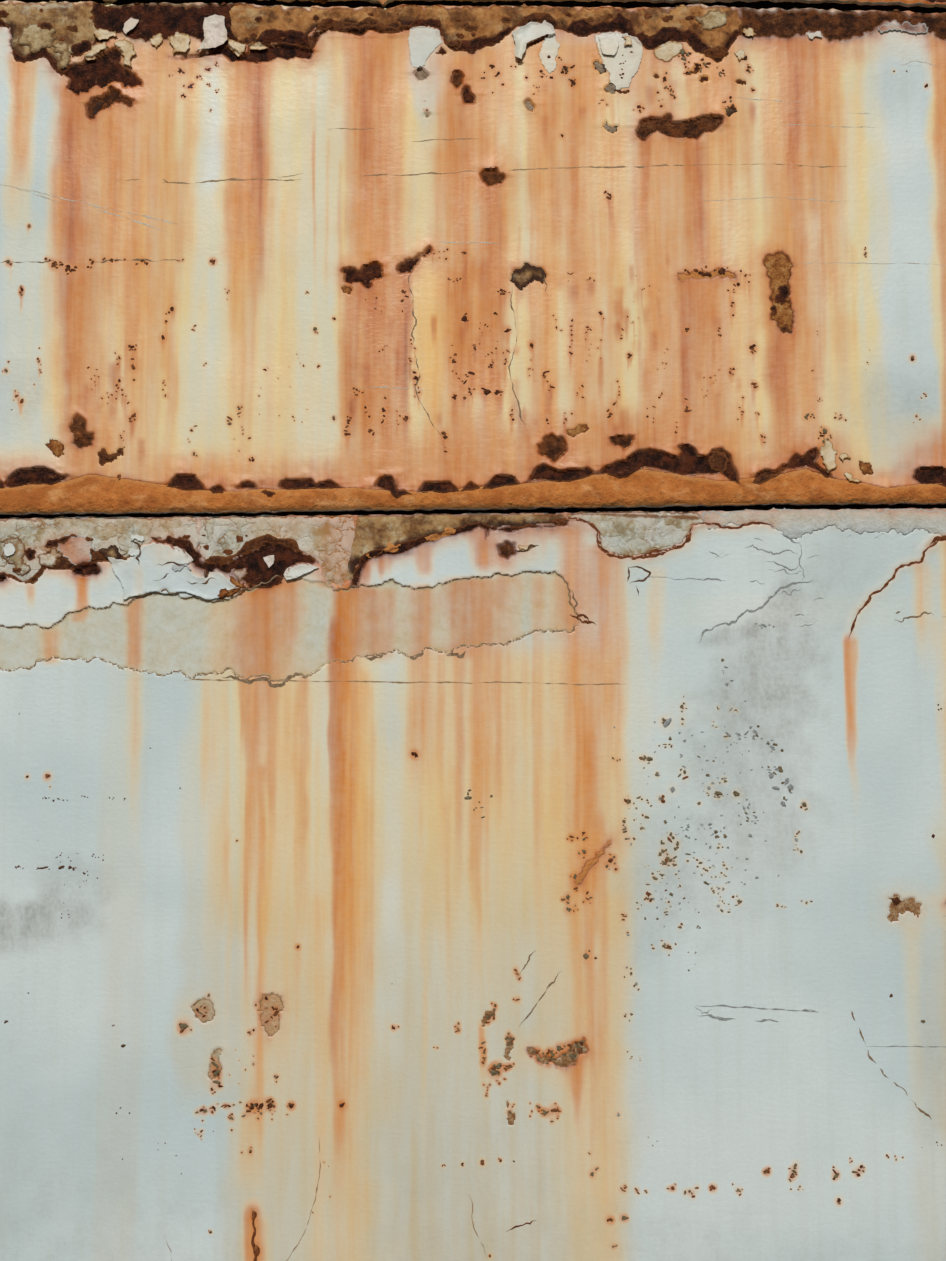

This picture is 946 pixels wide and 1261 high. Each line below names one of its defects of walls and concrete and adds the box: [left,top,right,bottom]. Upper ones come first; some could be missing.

spalling [415,66,429,80]
spalling [444,69,482,112]
spalling [445,17,487,50]
peeling [501,17,560,74]
peeling [565,12,756,99]
rust [0,0,946,499]
peeling [0,534,579,686]
crack [0,516,946,688]
rust [0,502,946,1261]